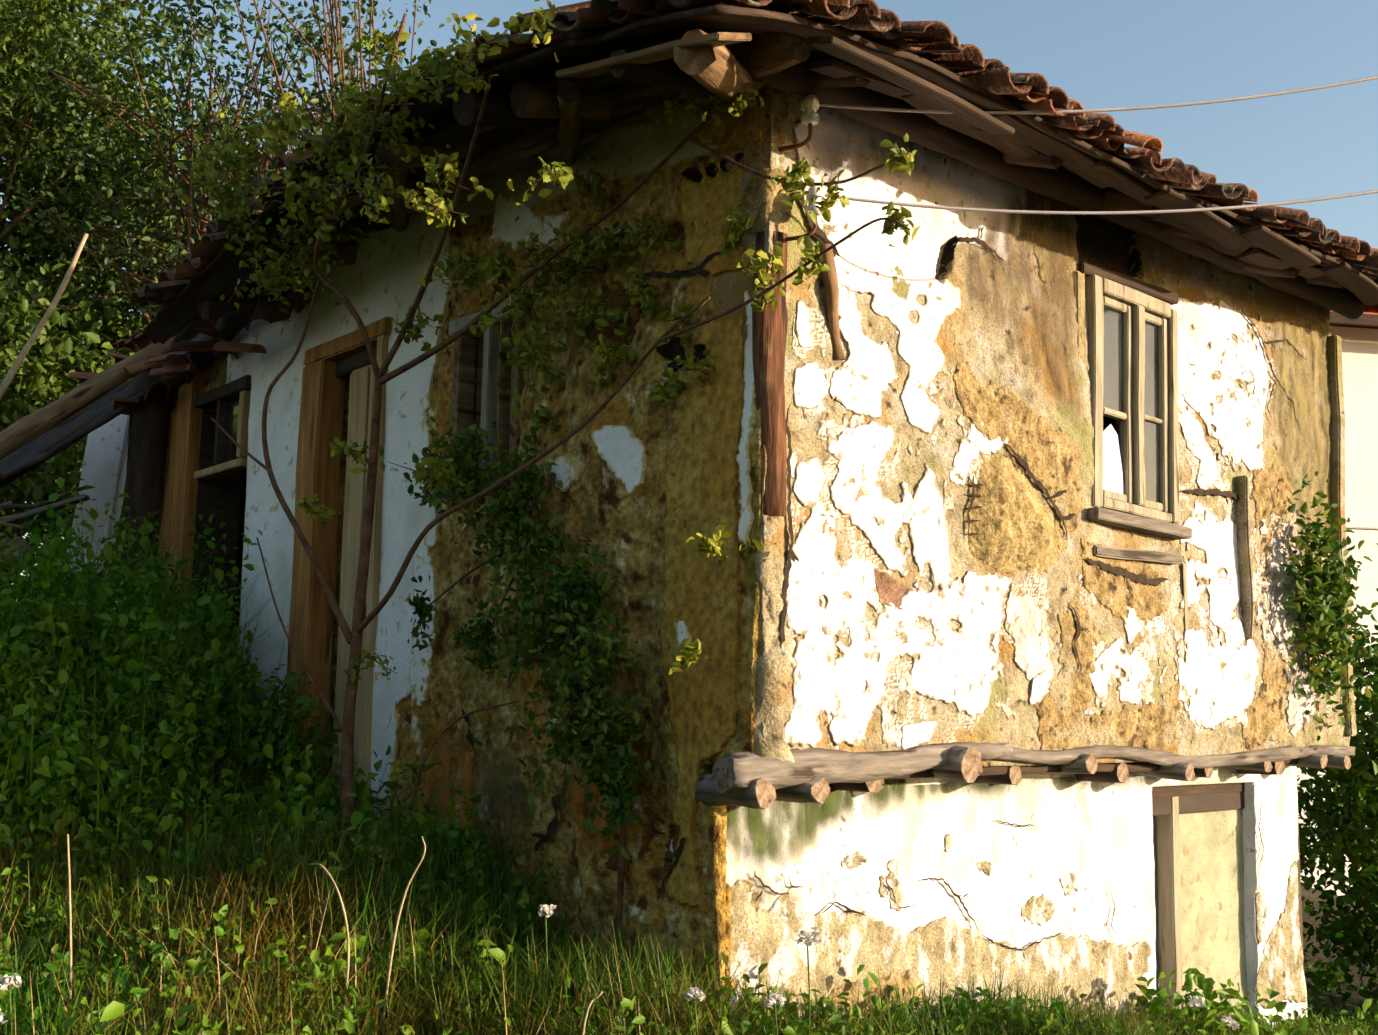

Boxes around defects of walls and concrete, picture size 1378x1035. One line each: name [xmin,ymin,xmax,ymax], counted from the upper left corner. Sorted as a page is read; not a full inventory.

flaking render [226,97,763,913]
flaking render [784,107,1333,753]
crack [1003,441,1168,591]
spalling [841,851,867,871]
crack [754,872,1064,959]
spalling [725,858,1152,1034]
spalling [944,834,952,853]